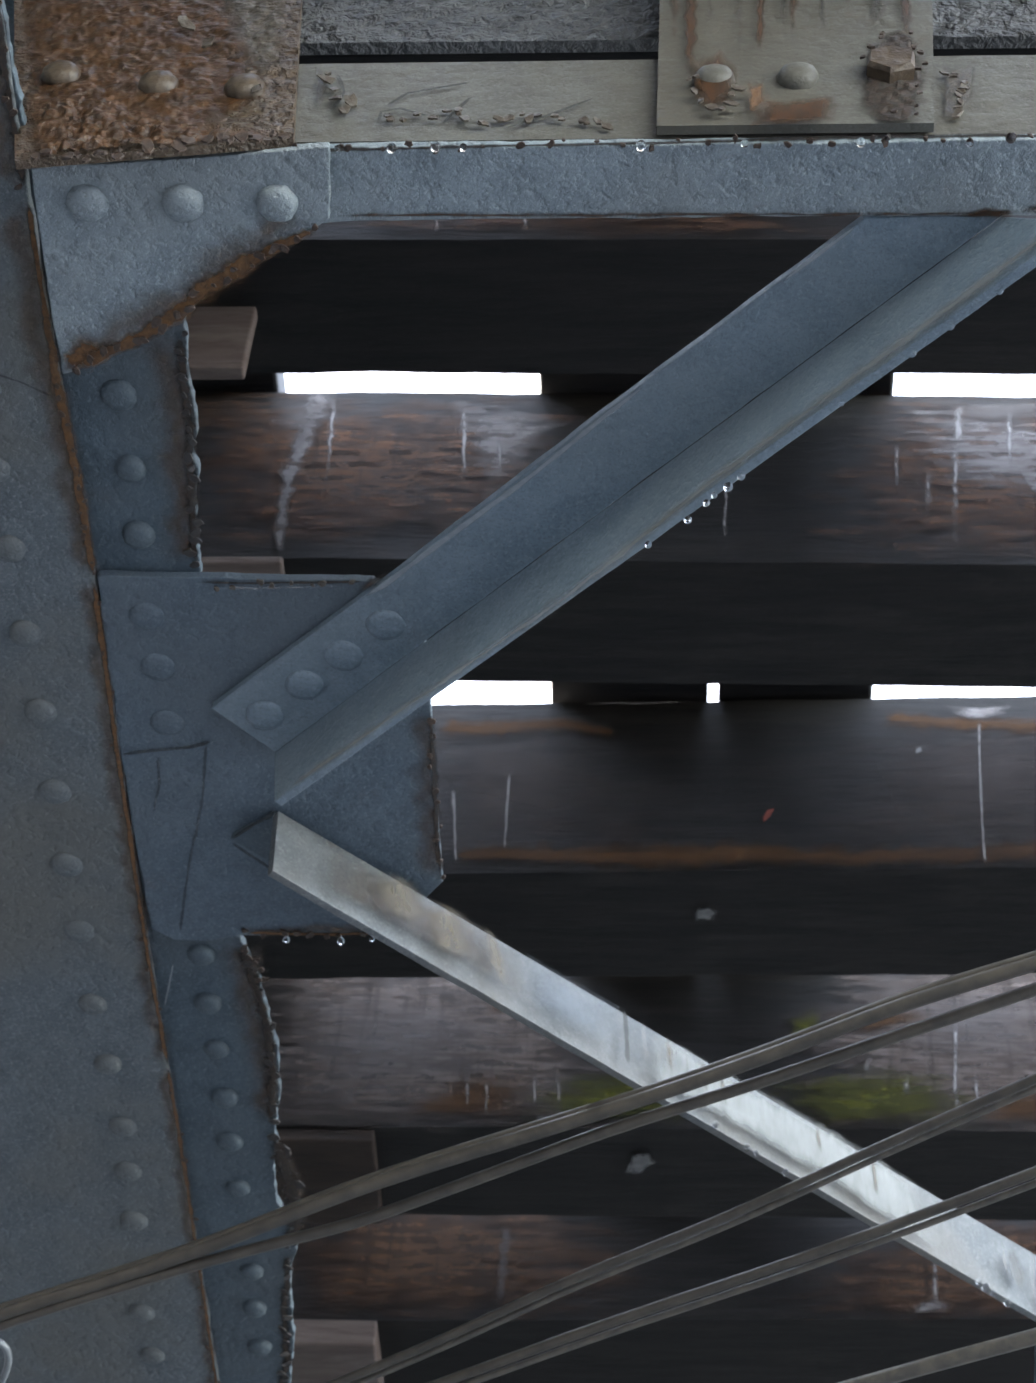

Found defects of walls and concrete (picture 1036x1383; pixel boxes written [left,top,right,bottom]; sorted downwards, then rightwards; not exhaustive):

rust [0,0,297,190]
rust [330,0,1036,155]
leakage [212,395,555,546]
leakage [817,404,1036,550]
rust [207,576,385,589]
rust [14,208,318,1241]
rust [239,928,369,1204]
rust [276,1217,305,1383]